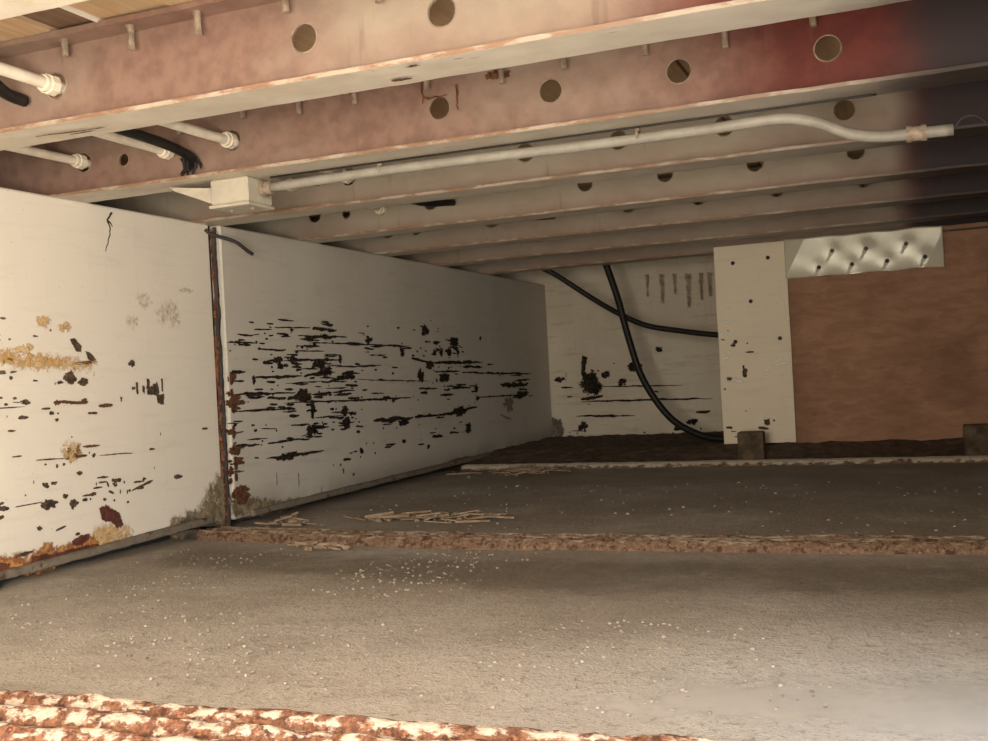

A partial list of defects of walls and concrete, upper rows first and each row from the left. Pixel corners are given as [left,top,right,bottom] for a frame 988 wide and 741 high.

peeling [0,397,31,432]
peeling [55,338,96,386]
rust [210,229,228,525]
peeling [225,372,246,412]
peeling [433,337,493,433]
peeling [554,355,643,405]
peeling [37,436,132,475]
peeling [224,424,251,505]
rust [0,525,130,576]
peeling [40,476,108,510]
peeling [72,532,90,546]
peeling [99,505,124,529]